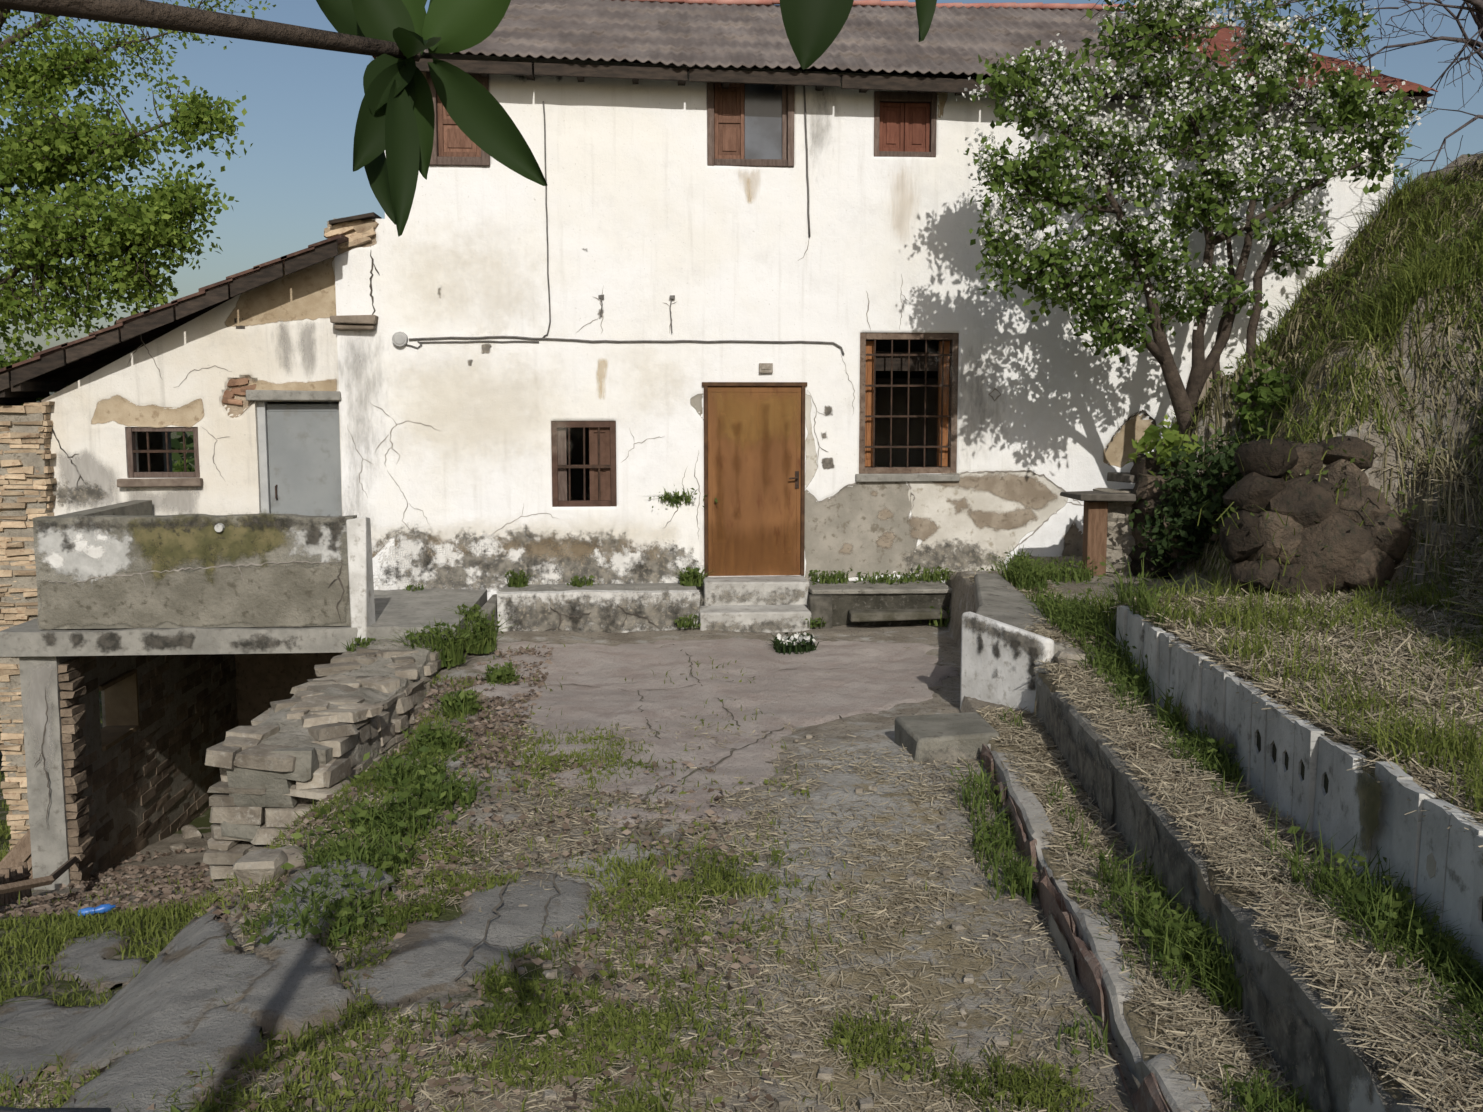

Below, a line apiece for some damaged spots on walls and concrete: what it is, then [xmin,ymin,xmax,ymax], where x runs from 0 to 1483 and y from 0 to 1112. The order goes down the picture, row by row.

spalling [225,218,379,329]
spalling [91,395,204,428]
spalling [222,376,337,418]
leakage [38,453,346,552]
crack [348,404,440,535]
spalling [805,394,1083,581]
leakage [372,525,810,633]